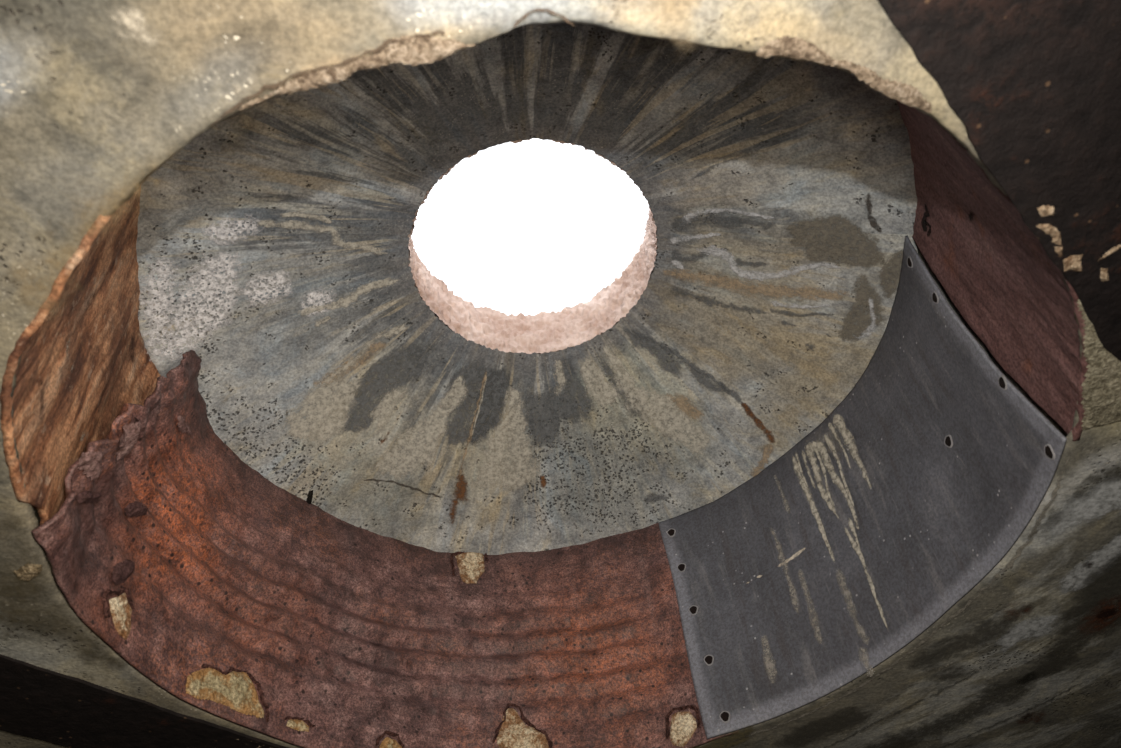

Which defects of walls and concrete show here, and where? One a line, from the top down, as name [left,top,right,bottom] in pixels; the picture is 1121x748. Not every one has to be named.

peeling [1036,205,1083,272]
peeling [1099,245,1121,281]
leakage [301,278,398,326]
leakage [287,325,434,442]
leakage [625,329,729,394]
leakage [375,346,714,489]
rust [112,559,135,585]
peeling [450,551,489,584]
peeling [102,586,135,640]
peeling [185,664,270,722]
peeling [492,703,553,748]
peeling [665,705,701,747]